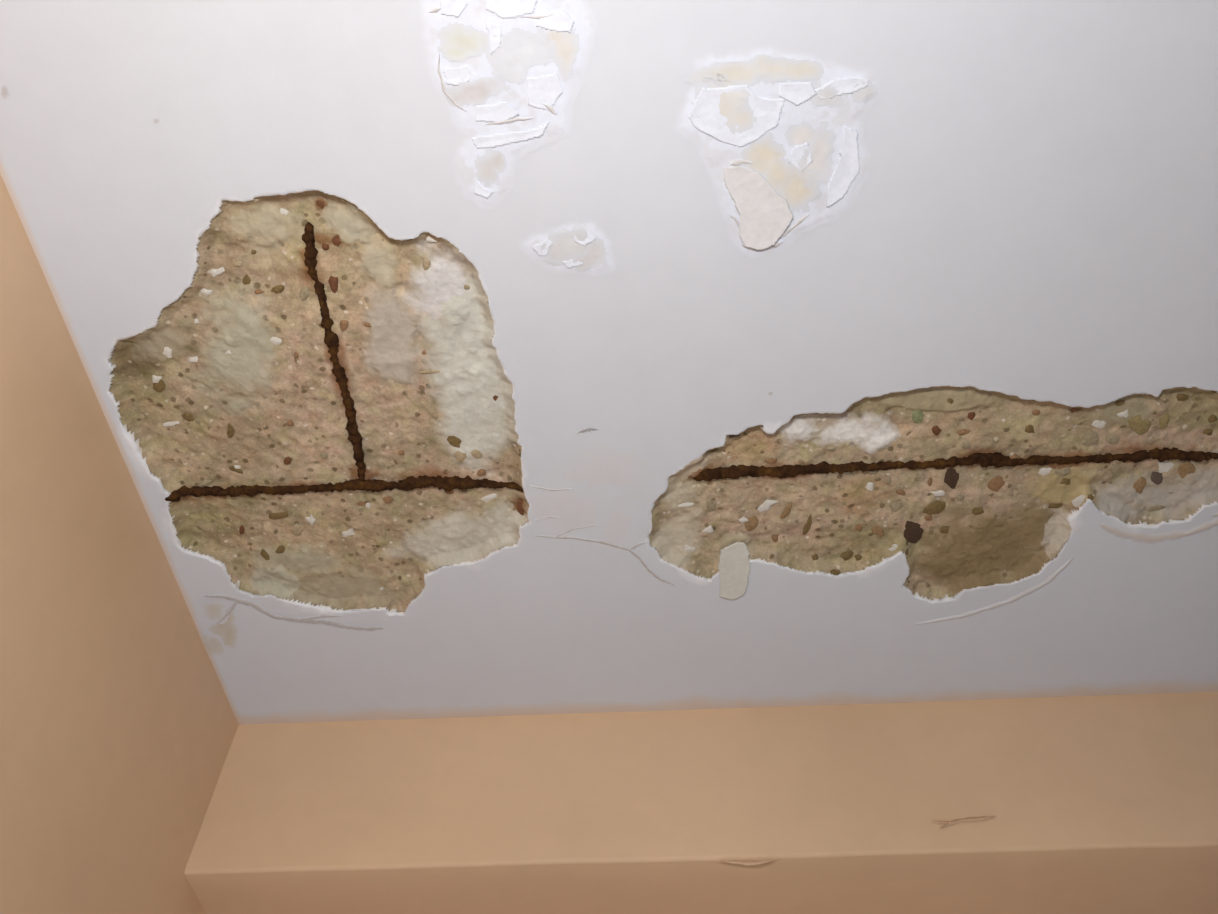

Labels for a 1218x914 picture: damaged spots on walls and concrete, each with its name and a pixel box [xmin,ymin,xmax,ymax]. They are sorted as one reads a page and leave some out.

spalling [89,171,540,626]
spalling [635,370,1218,625]